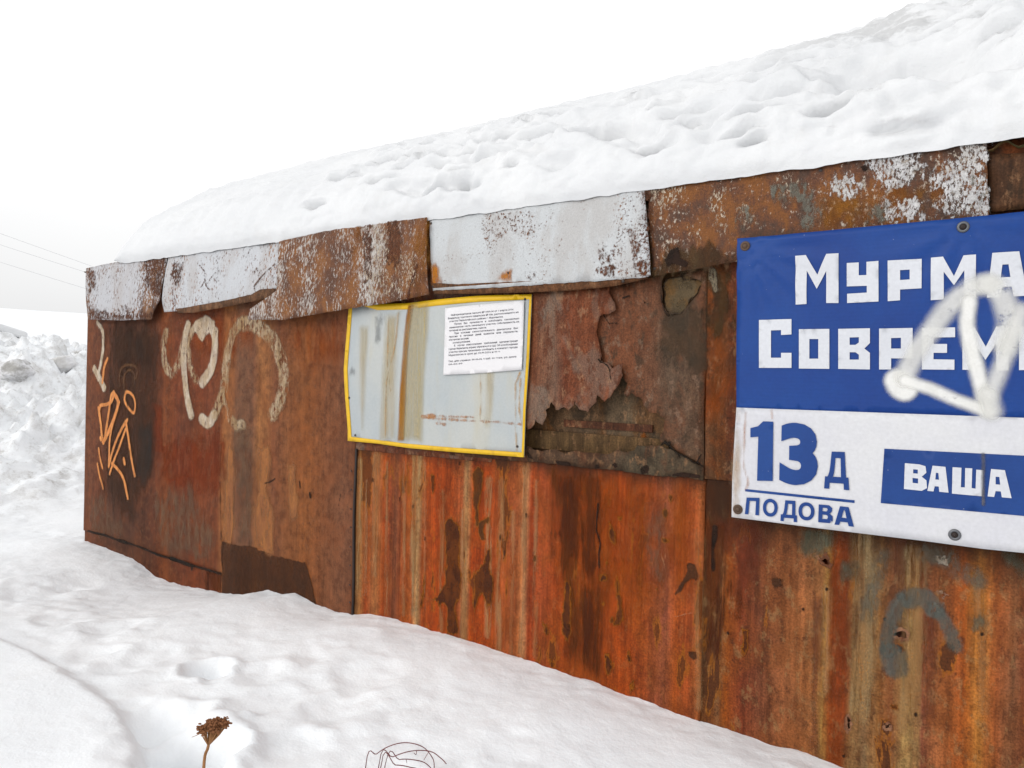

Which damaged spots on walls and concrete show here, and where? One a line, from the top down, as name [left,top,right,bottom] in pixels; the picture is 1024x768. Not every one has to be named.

rust [358,224,373,284]
rust [385,220,402,269]
rust [882,189,908,213]
rust [224,446,235,544]
rust [253,447,274,555]
rust [403,455,536,651]
rust [552,460,624,675]
rust [675,518,740,657]
rust [851,603,872,721]